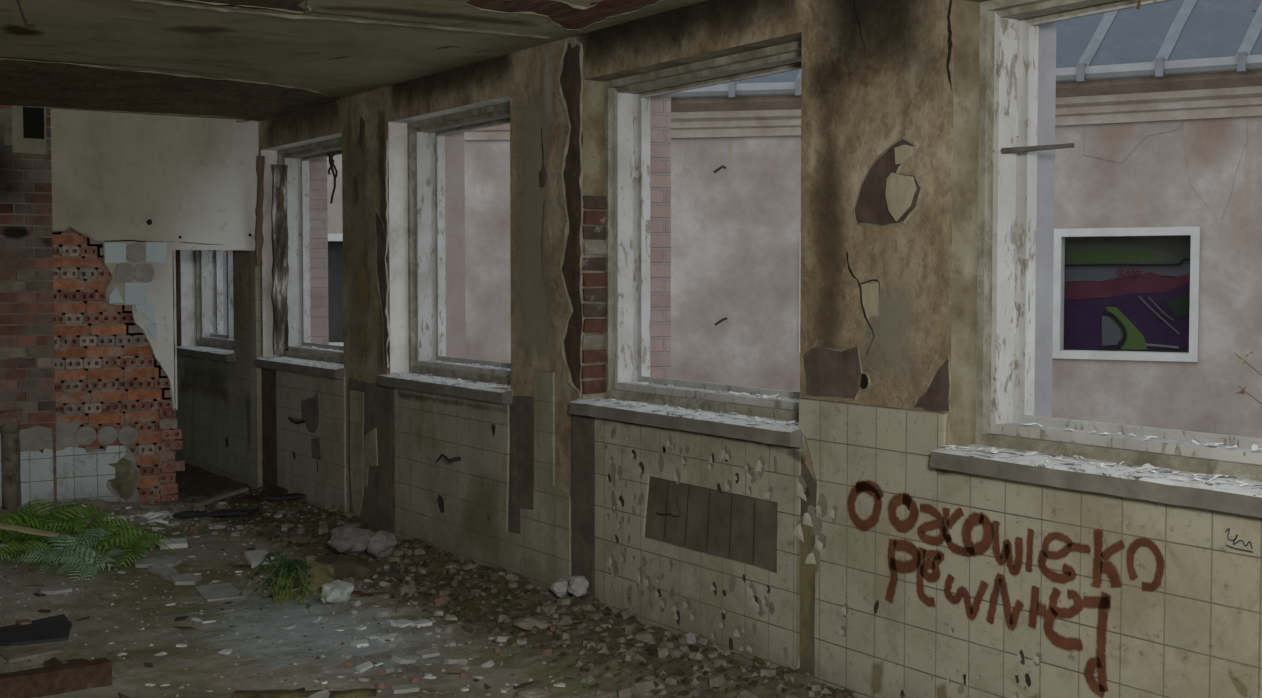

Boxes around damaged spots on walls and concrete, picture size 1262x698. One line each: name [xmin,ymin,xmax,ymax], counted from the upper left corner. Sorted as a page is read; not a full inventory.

spalling [0,58,343,122]
spalling [186,0,312,13]
crack [945,0,953,90]
spalling [463,0,798,428]
spalling [853,137,923,228]
flaking render [52,225,176,503]
peeling [262,346,337,489]
peeling [348,139,534,534]
spalling [625,345,871,401]
crack [846,252,880,358]
peeling [570,414,777,655]
peeling [767,458,837,676]